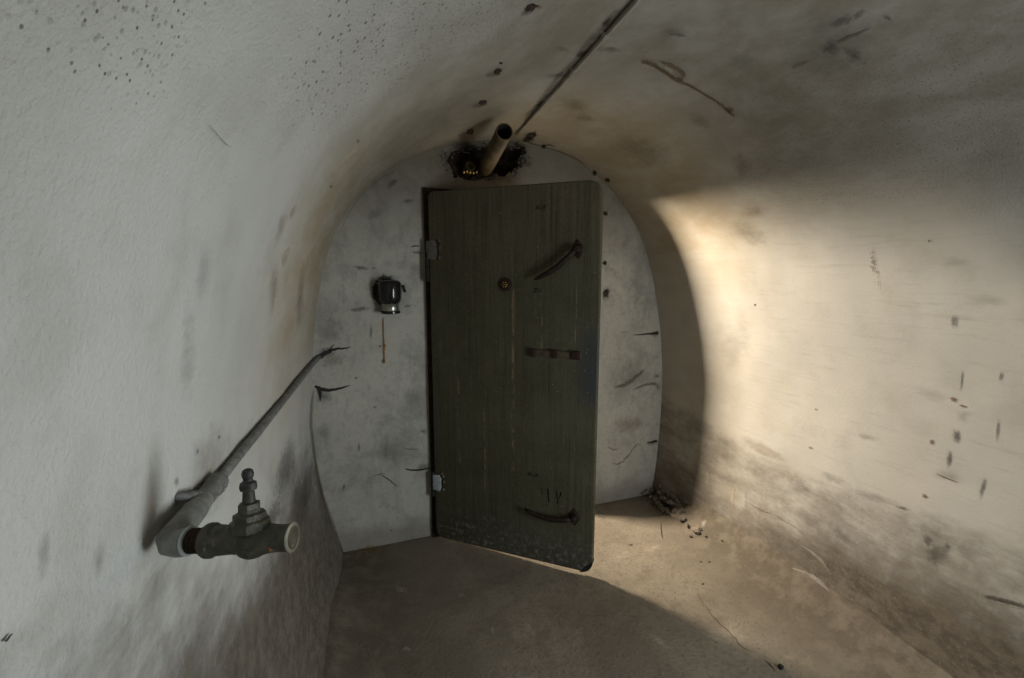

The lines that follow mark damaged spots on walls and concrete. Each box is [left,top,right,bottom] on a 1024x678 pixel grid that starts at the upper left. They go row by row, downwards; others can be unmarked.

crack [642,60,734,116]
spalling [448,131,554,180]
crack [315,345,350,359]
crack [315,385,350,401]